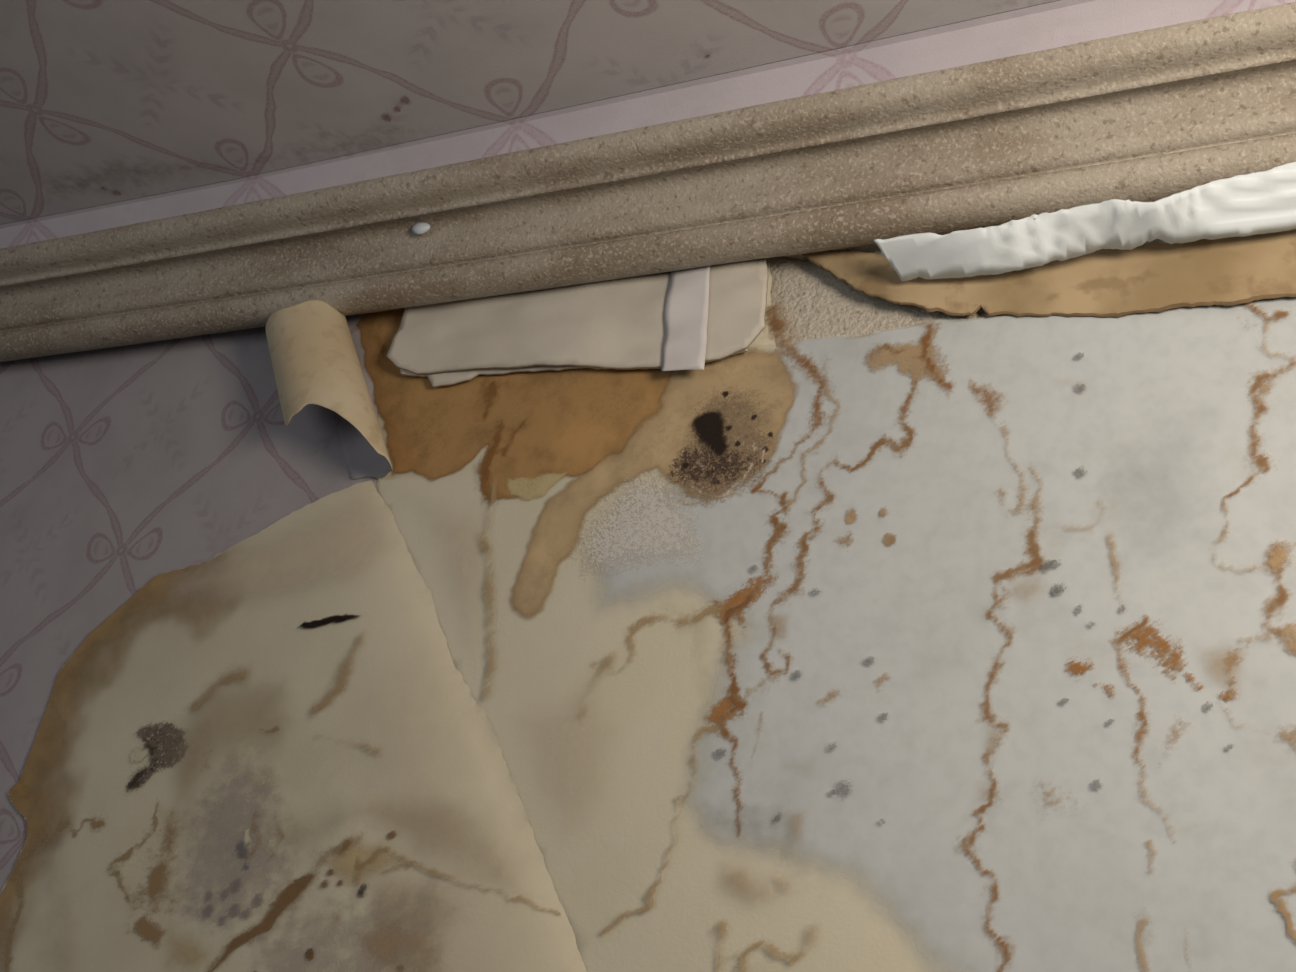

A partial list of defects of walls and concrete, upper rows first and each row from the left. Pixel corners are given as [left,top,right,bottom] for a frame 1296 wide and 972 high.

leakage [0,521,362,972]
leakage [357,297,1296,972]